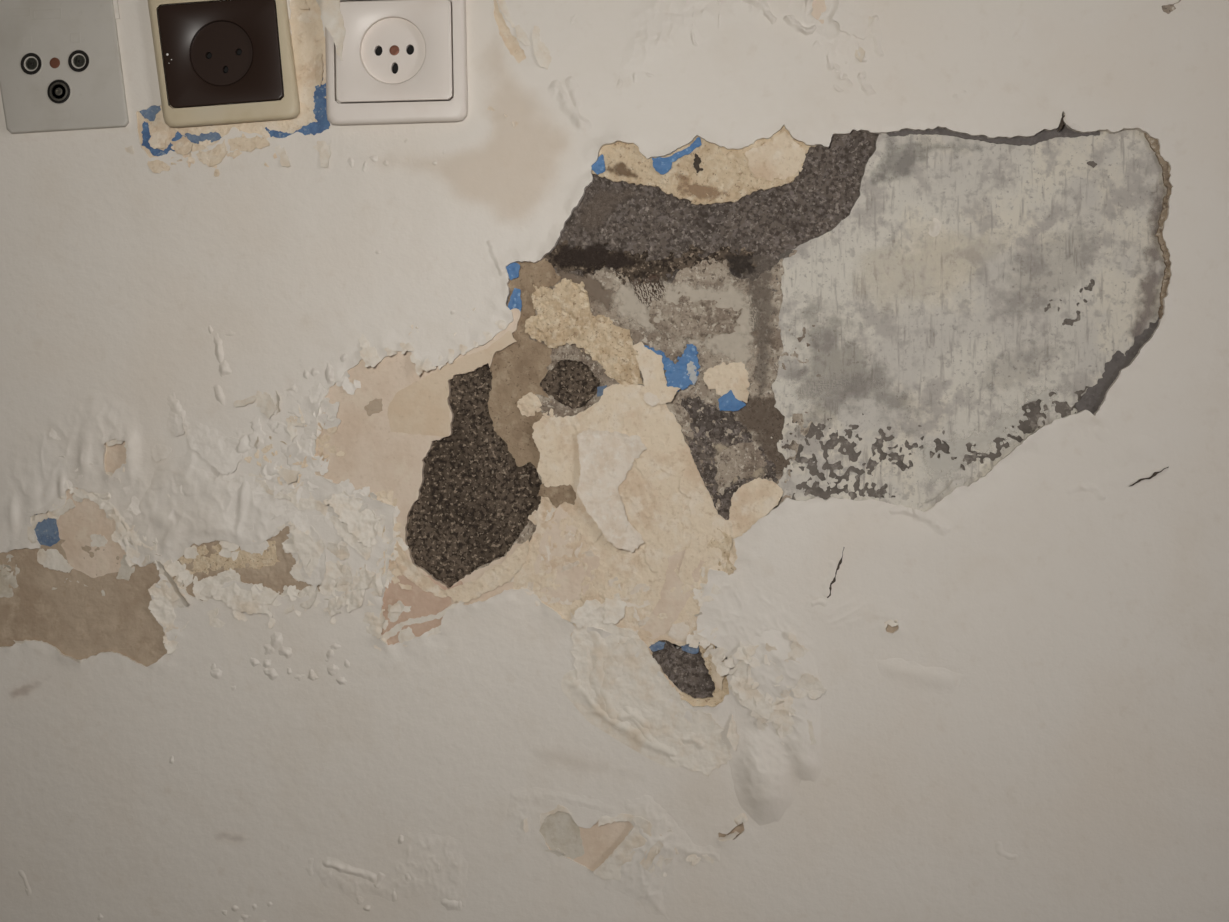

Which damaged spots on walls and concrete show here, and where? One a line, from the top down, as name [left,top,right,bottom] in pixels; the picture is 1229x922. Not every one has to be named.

peeling [125,0,346,177]
crack [1162,0,1185,18]
spalling [0,116,1172,707]
peeling [717,813,748,841]